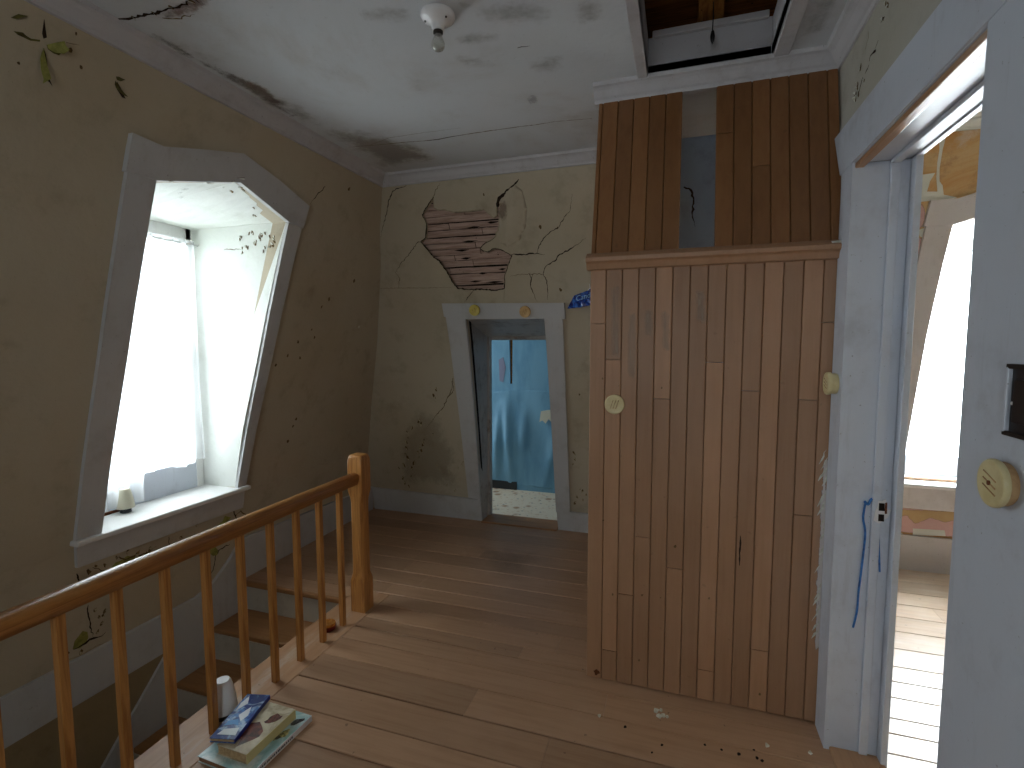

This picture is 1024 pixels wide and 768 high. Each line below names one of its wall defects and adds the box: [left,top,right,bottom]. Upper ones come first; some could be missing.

crack [118,0,198,21]
peeling [11,14,77,85]
water stain [228,75,281,109]
crack [496,179,519,207]
crack [683,187,696,227]
spalling [421,197,513,291]
crack [512,199,586,300]